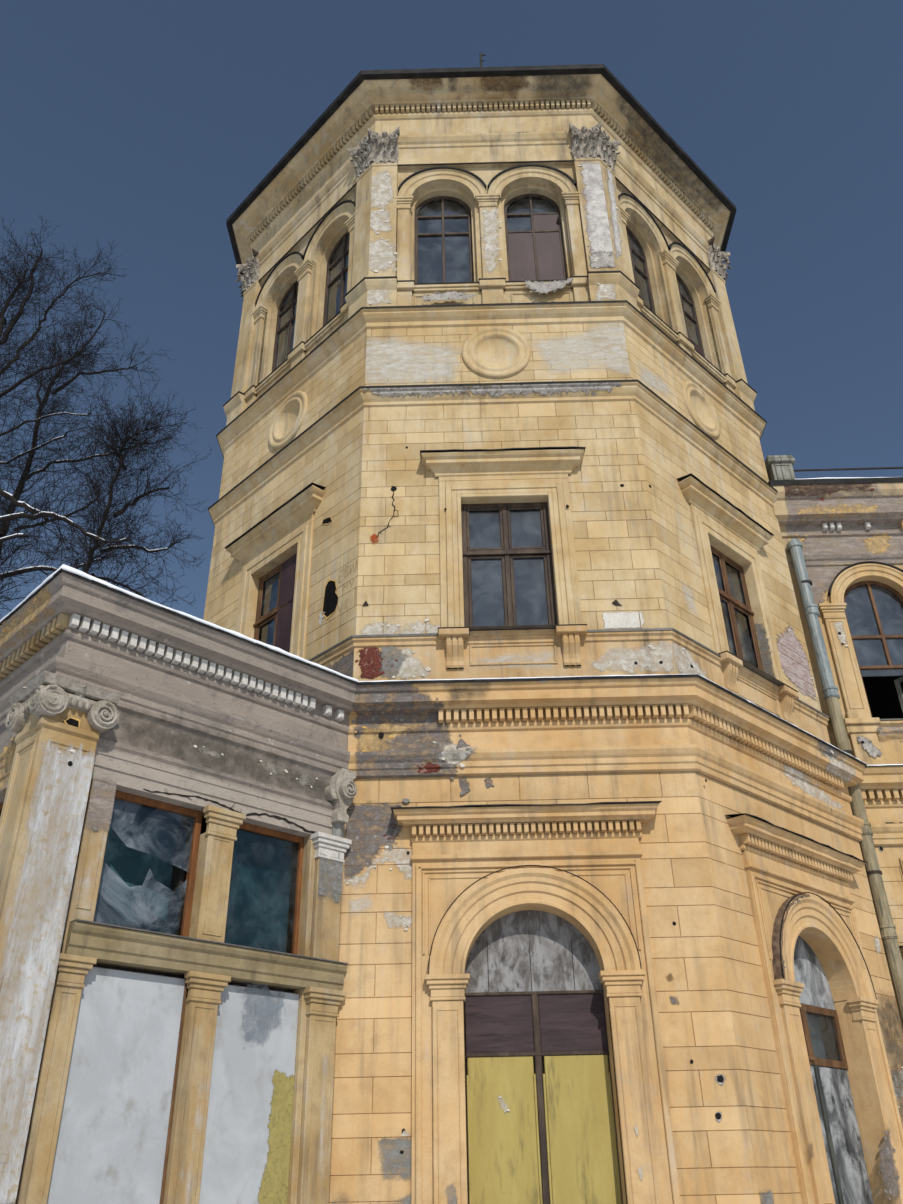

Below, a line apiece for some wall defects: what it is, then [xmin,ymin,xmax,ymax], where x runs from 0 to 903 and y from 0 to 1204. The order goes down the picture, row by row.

peeling [578,162,622,301]
spalling [64,717,81,727]
flaking render [328,618,479,795]
peeling [602,599,644,629]
peeling [591,641,706,678]
flaking render [776,625,816,701]
flaking render [318,798,412,911]
peeling [0,737,117,1204]
peeling [384,912,412,931]
water stain [877,1003,903,1120]